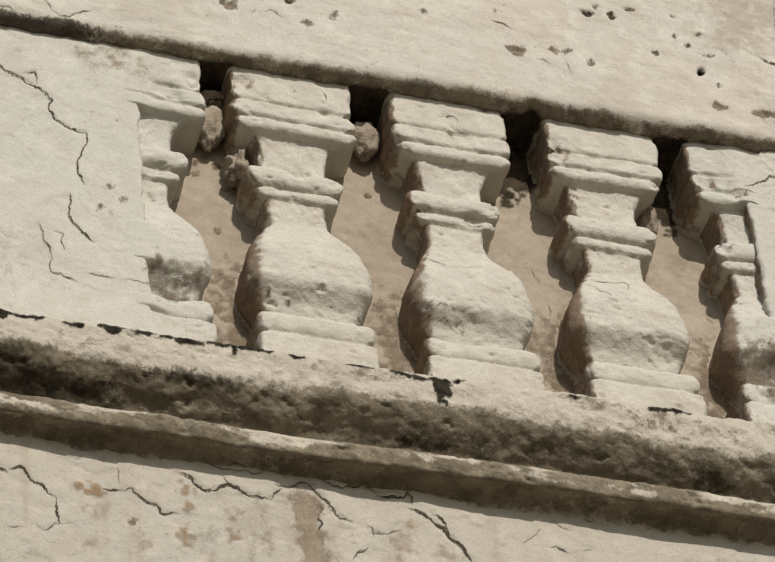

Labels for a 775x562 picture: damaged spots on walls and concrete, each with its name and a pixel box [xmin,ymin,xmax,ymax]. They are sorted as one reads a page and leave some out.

spalling [505,45,526,55]
spalling [751,109,775,117]
crack [0,65,115,282]
leakage [528,122,569,206]
leakage [97,323,172,339]
leakage [550,186,597,399]
leakage [669,146,751,421]
leakage [744,206,763,295]
crack [0,465,69,530]
crack [101,467,173,515]
crack [179,465,472,562]